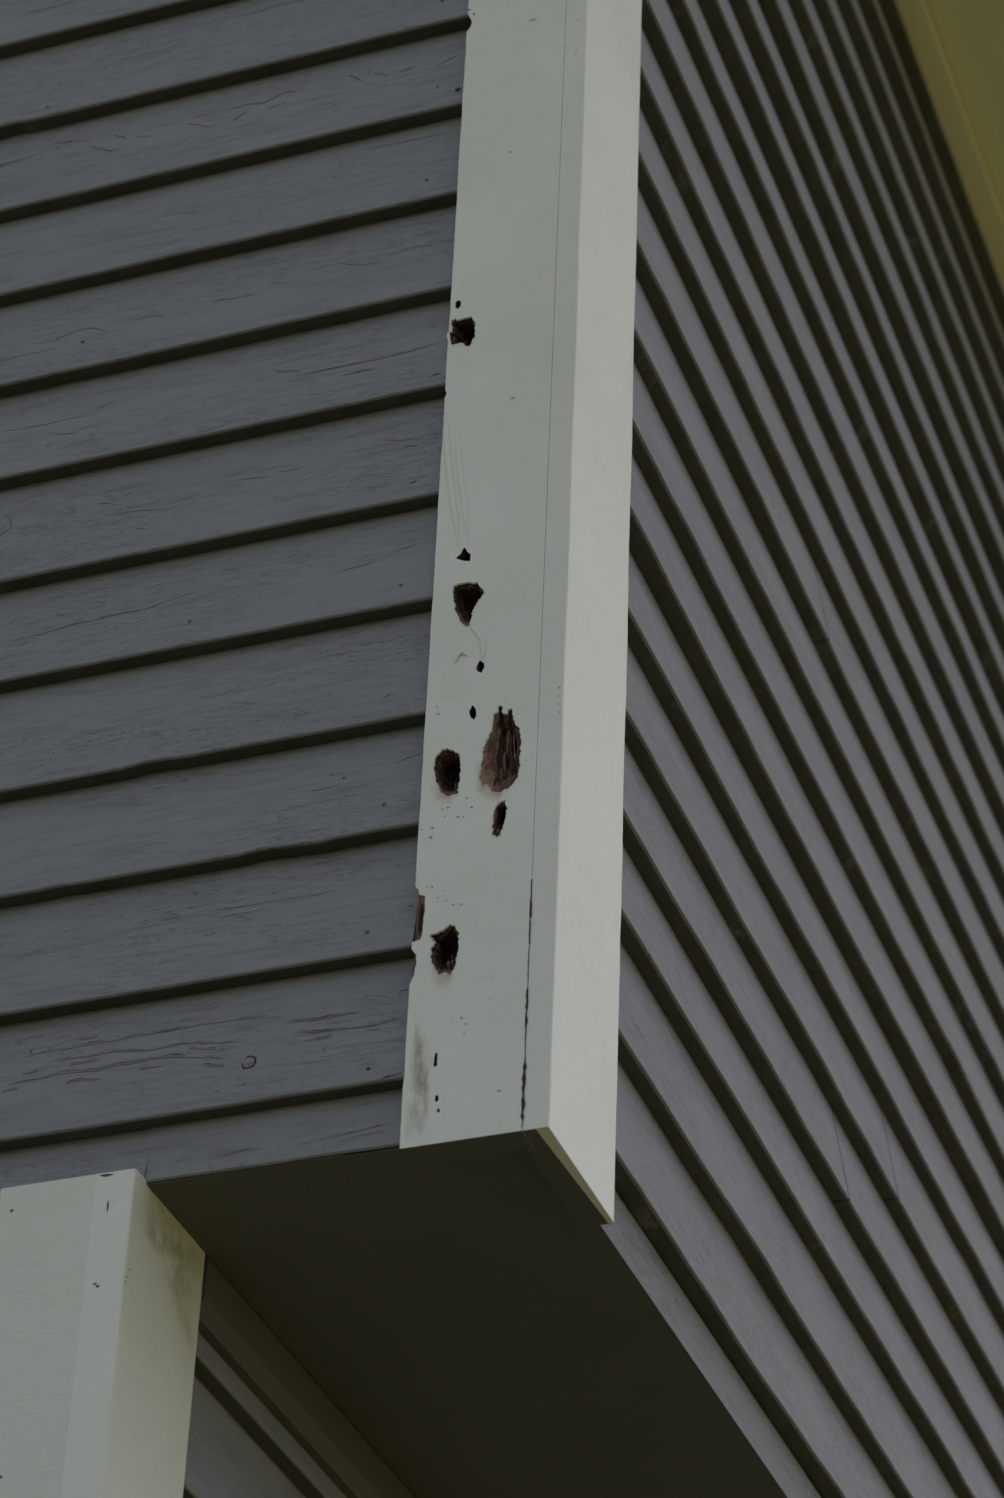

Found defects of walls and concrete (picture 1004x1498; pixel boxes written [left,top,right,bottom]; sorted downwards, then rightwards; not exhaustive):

peeling [447,315,478,348]
peeling [451,581,486,628]
peeling [421,704,524,840]
peeling [427,886,462,977]
crack [520,879,532,1126]